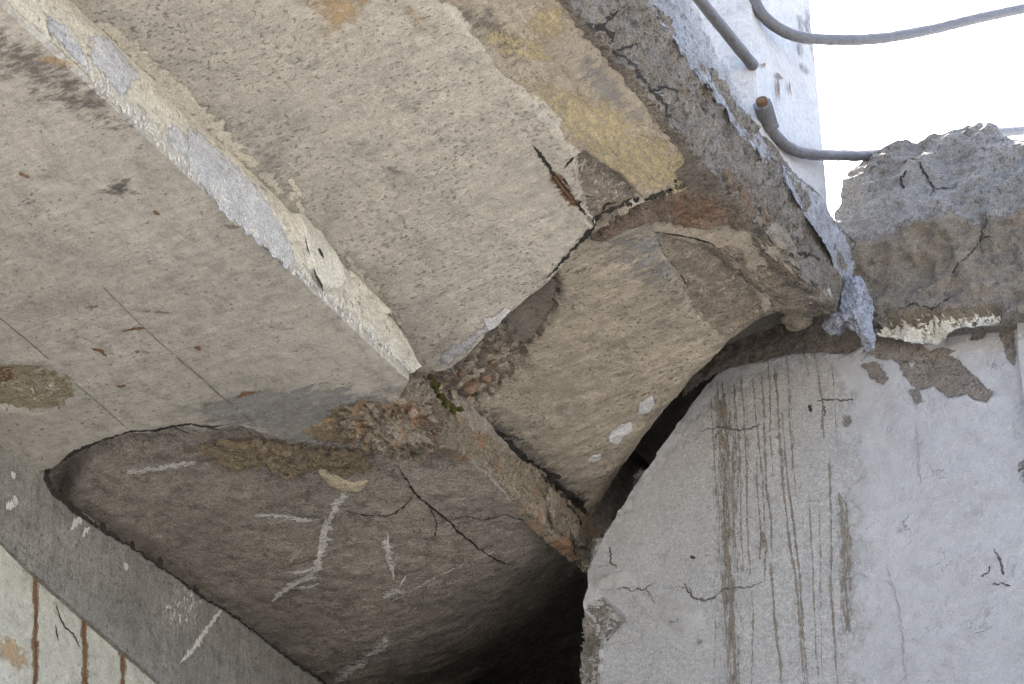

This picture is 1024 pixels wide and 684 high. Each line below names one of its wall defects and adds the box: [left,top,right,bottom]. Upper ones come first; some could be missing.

peeling [46,15,140,97]
crack [577,10,682,134]
rust [550,172,579,206]
crack [544,178,686,281]
spalling [553,0,1016,404]
spalling [423,273,562,404]
spalling [185,416,375,481]
crack [269,466,523,606]
crack [608,546,766,603]
rust [0,577,39,684]
rust [80,620,89,684]
rust [118,653,127,684]